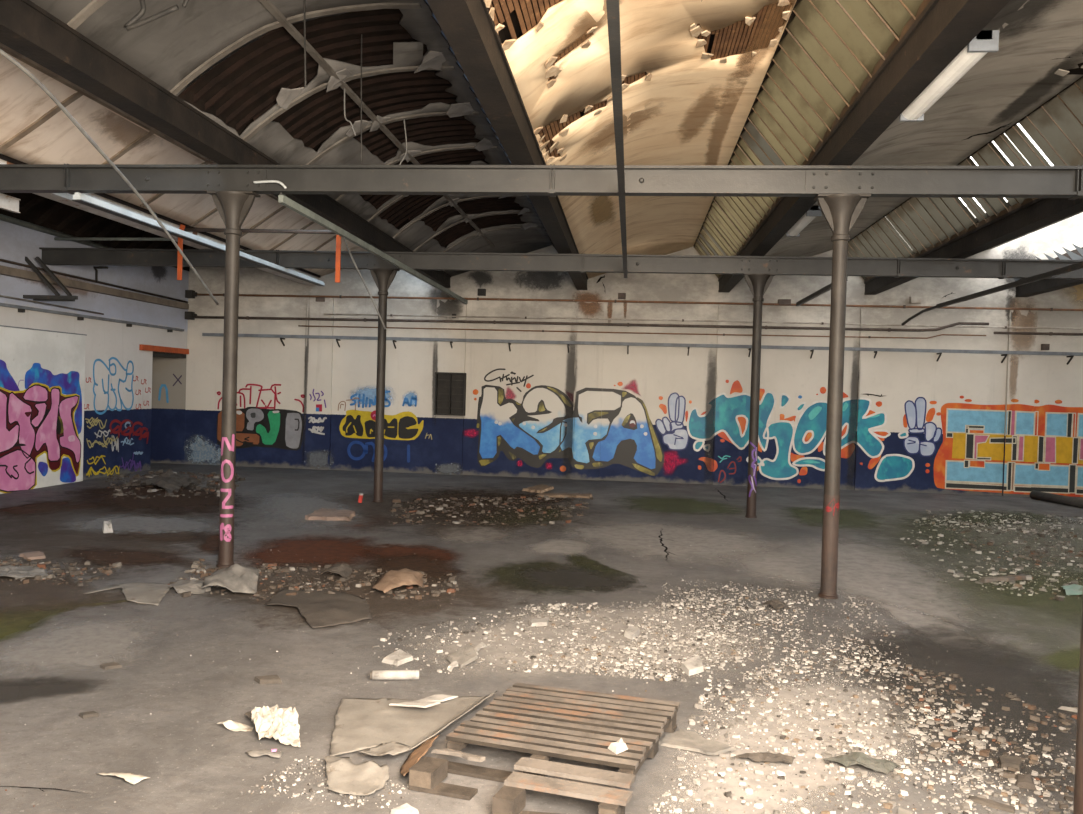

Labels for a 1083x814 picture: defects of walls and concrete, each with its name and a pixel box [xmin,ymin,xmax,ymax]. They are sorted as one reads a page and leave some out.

spalling [484,0,562,51]
spalling [689,0,791,63]